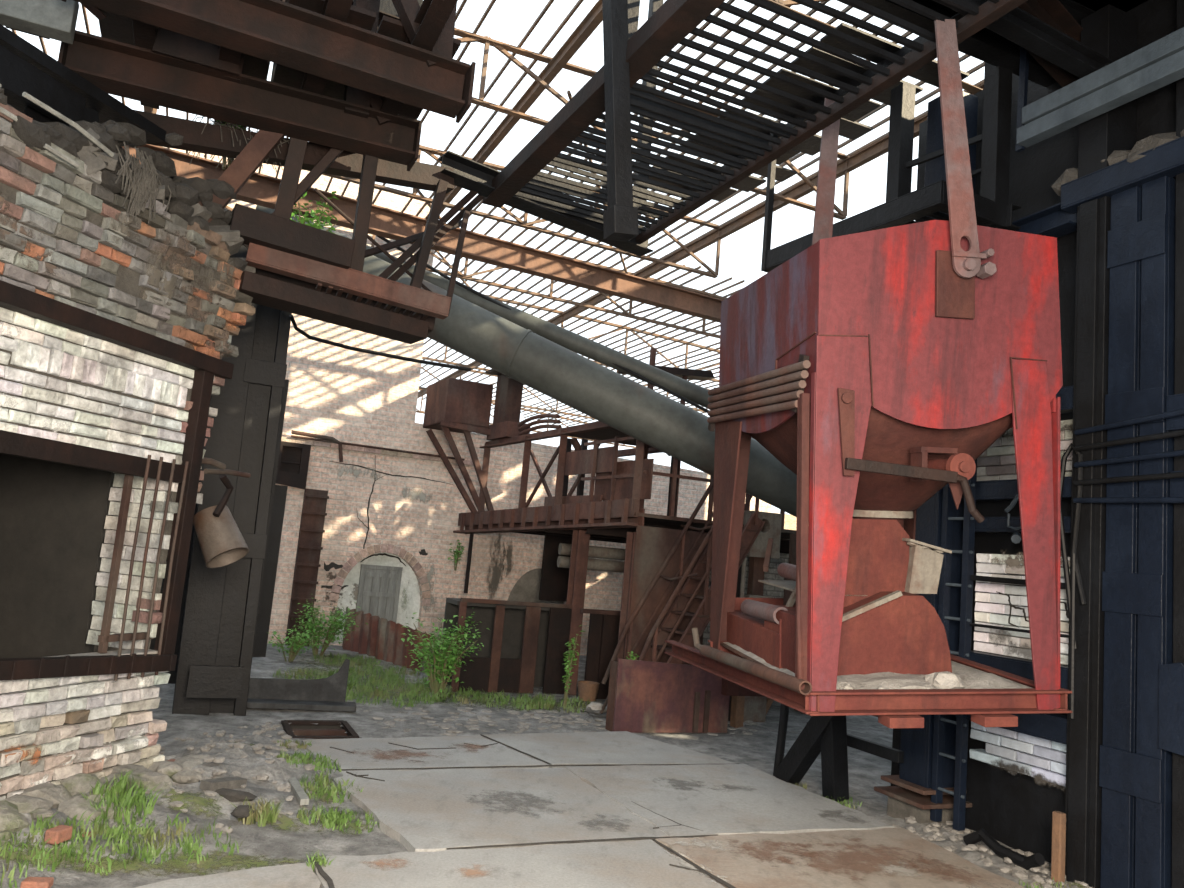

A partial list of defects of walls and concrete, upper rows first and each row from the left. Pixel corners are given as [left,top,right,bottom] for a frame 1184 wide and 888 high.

crack [330,455,453,566]
water stain [487,536,512,599]
crack [996,591,1029,628]
crack [310,858,335,888]